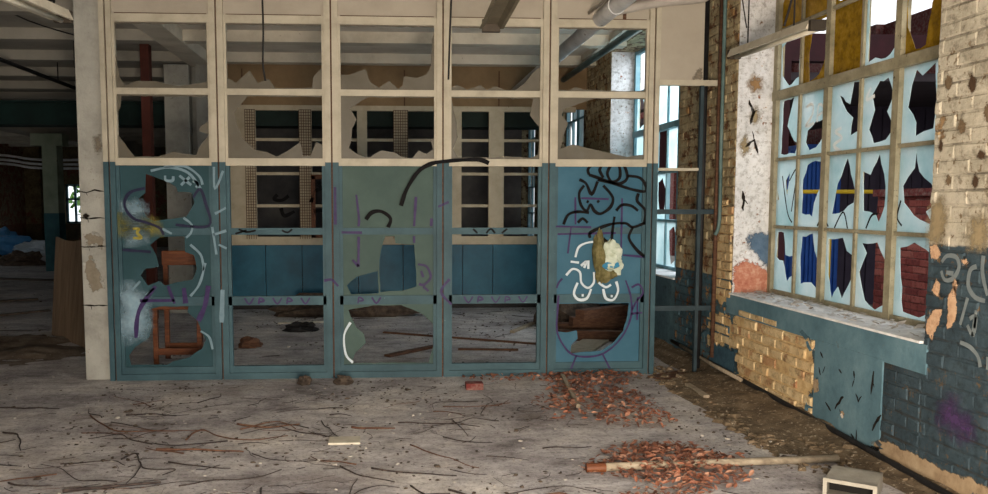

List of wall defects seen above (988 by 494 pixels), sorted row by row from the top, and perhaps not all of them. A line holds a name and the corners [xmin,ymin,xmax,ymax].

flaking render [702,200,961,414]